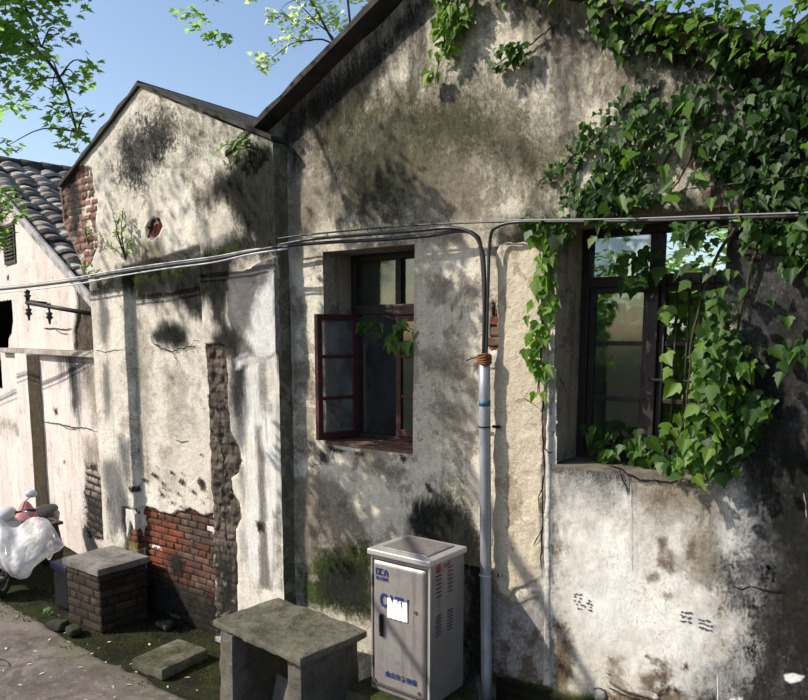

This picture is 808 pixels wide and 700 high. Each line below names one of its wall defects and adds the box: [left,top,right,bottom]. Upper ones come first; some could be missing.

leakage [107,101,222,196]
flaking render [60,165,98,271]
spalling [148,218,163,240]
leakage [91,141,275,450]
leakage [273,0,808,700]
flaking render [82,469,104,546]
leakage [85,437,133,533]
flaking render [125,340,242,636]
leakage [256,428,270,588]
crack [607,465,689,567]
rust [657,538,673,572]